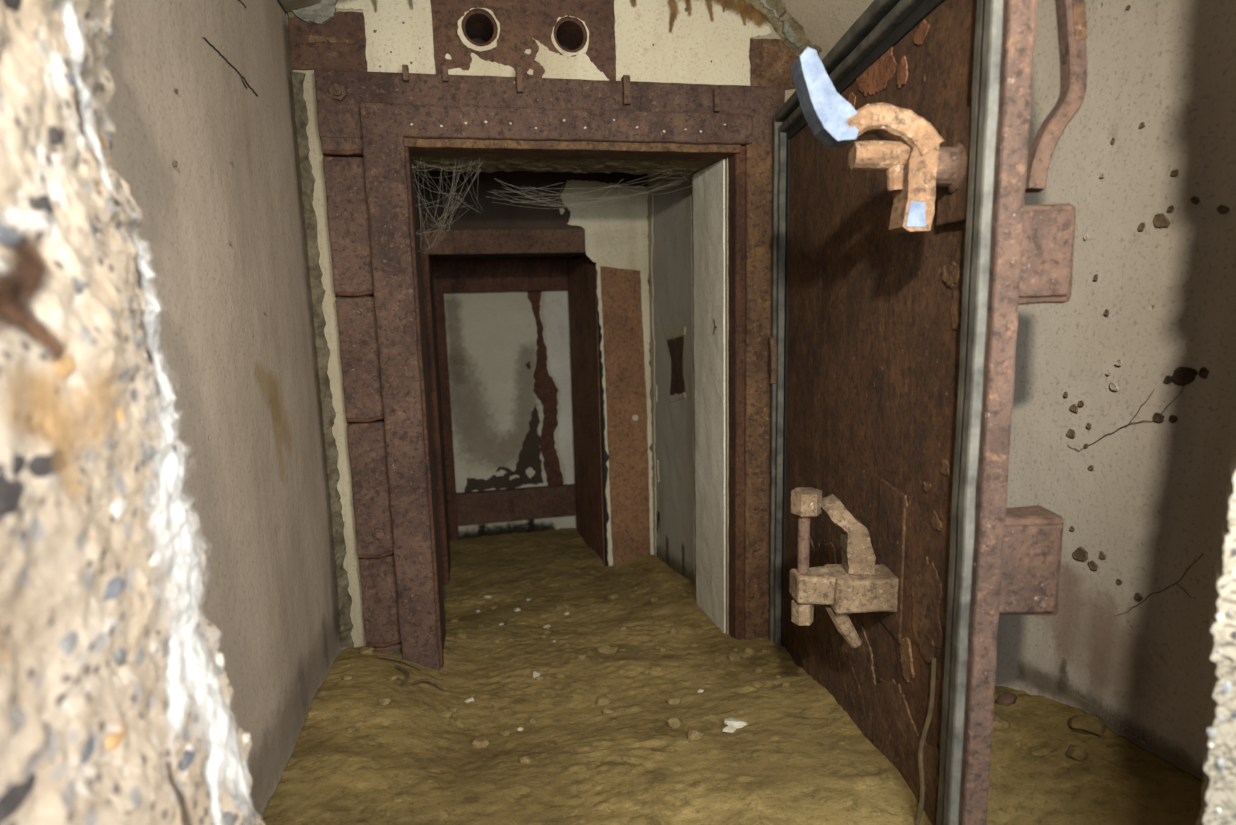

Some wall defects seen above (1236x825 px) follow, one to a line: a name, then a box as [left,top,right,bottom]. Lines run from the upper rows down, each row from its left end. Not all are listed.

rust [913,20,930,45]
crack [202,37,258,96]
rust [847,47,908,109]
peeling [287,0,822,650]
rust [942,262,962,329]
spalling [0,0,265,825]
crack [1068,386,1184,451]
rust [809,537,837,568]
spalling [1196,455,1236,825]
rust [793,556,944,825]